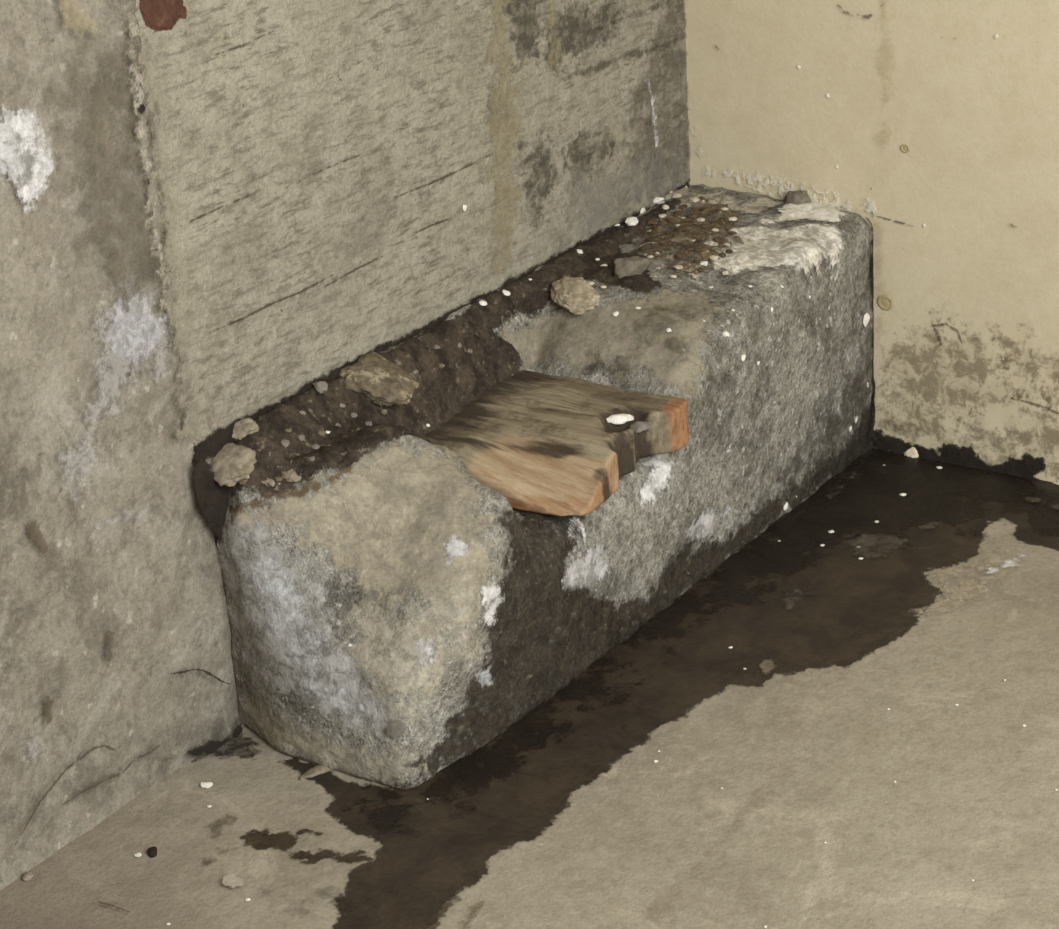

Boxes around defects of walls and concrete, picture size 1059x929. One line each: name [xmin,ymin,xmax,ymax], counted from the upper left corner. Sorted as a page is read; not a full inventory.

corrosion [139,0,187,32]
water stain [0,107,54,212]
water stain [217,310,1059,929]